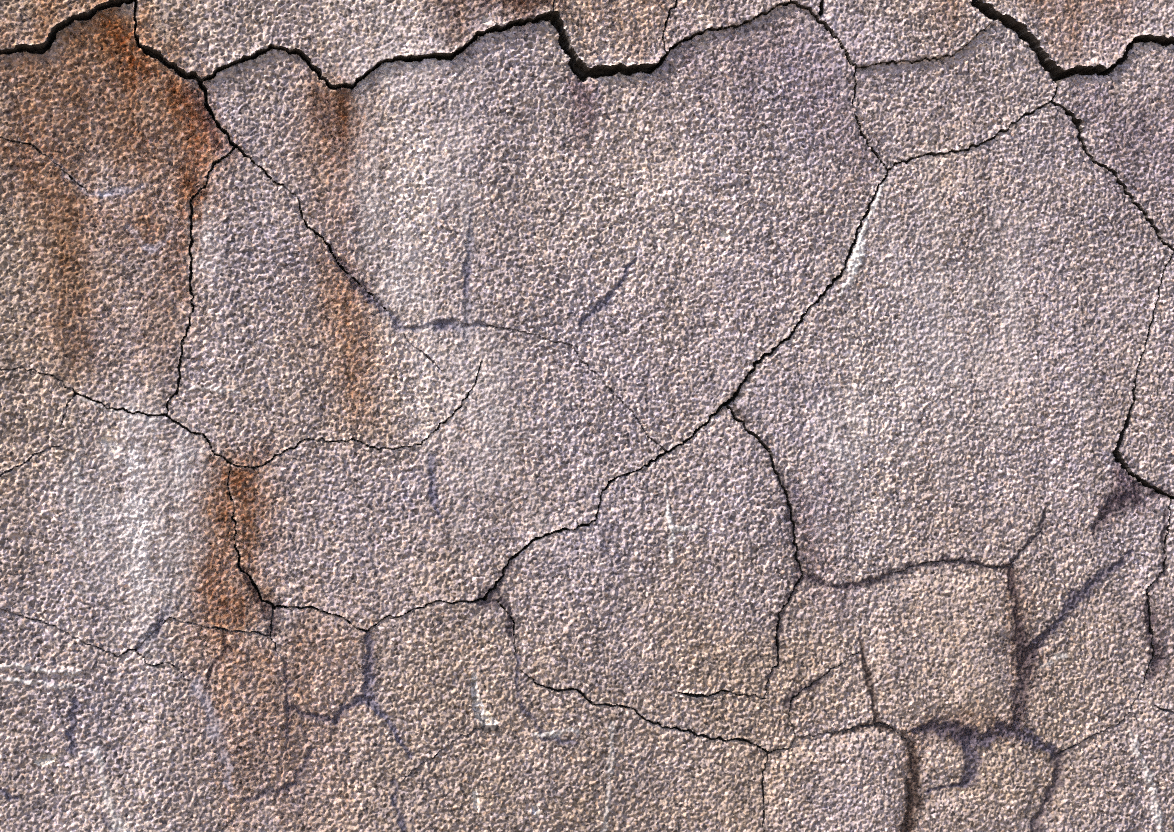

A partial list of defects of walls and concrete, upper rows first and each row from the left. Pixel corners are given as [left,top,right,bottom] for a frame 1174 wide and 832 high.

crack [0,0,857,681]
crack [407,0,1174,696]
crack [402,728,479,781]
crack [520,652,910,832]
crack [1057,727,1109,755]
crack [1115,687,1143,726]